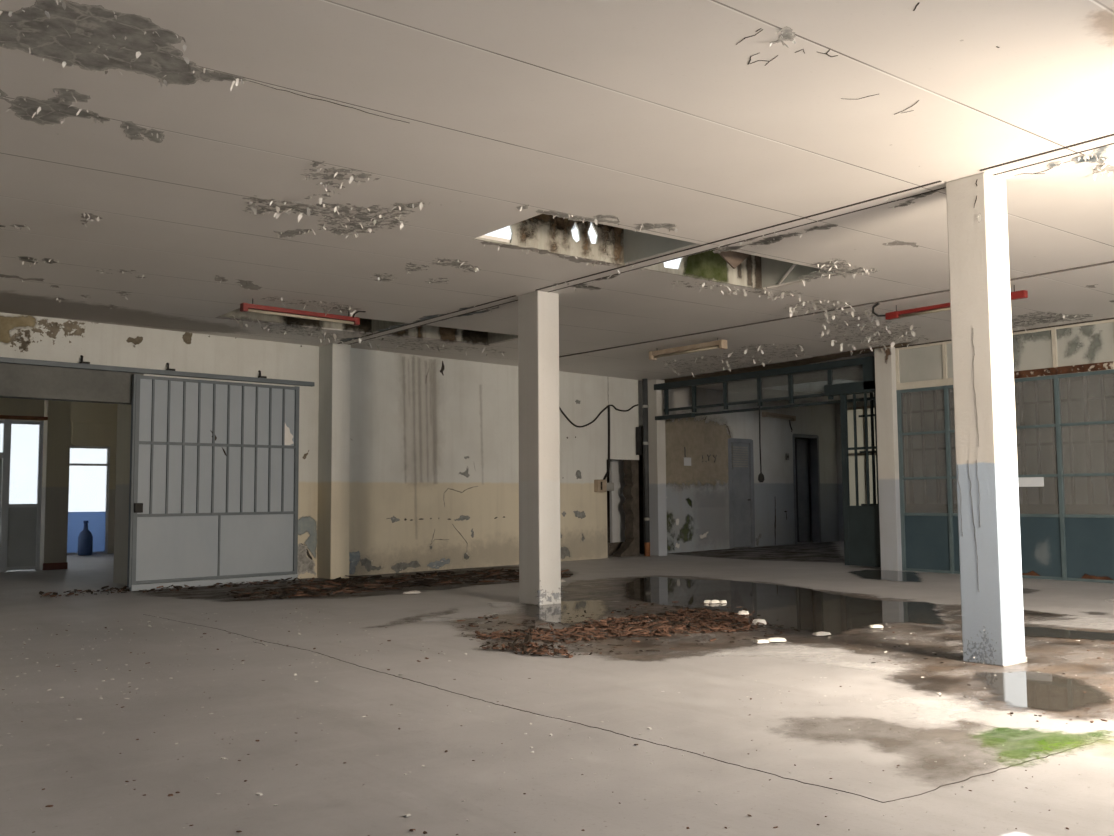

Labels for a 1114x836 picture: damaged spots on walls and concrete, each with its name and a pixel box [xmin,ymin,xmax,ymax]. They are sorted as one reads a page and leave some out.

peeling [0,0,248,91]
peeling [0,88,164,143]
peeling [1048,146,1114,180]
peeling [242,160,424,238]
peeling [10,318,98,353]
peeling [664,260,928,377]
peeling [349,546,450,574]